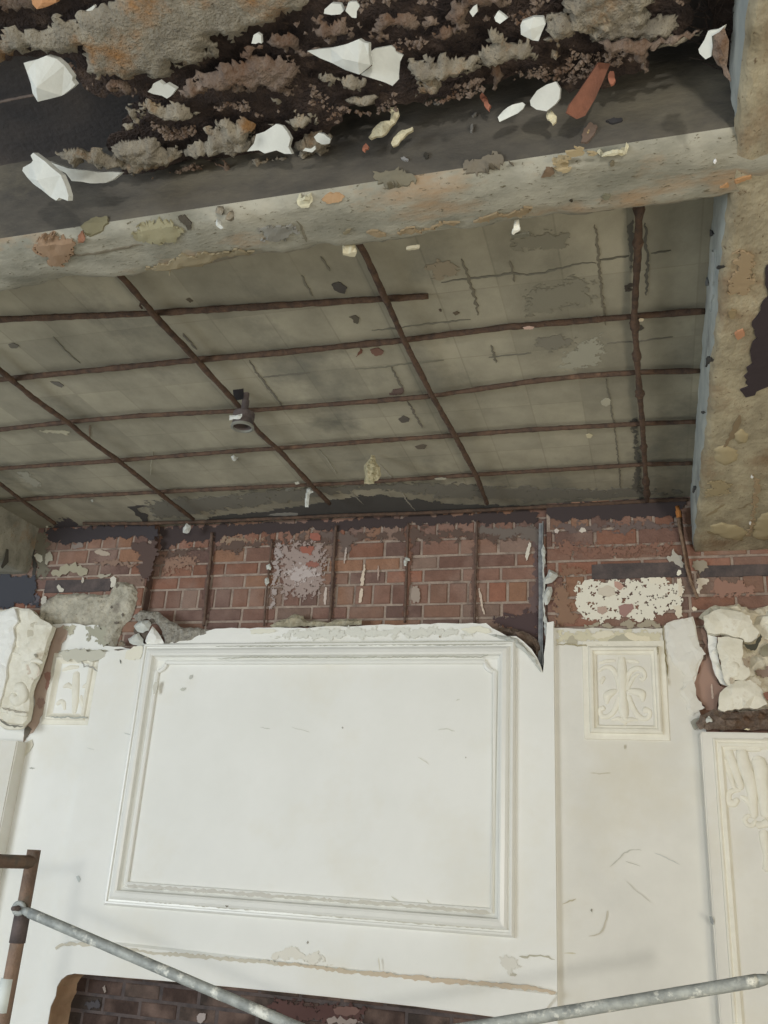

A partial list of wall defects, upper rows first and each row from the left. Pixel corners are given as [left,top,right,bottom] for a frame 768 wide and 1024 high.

spalling [541,142,629,178]
peeling [297,193,313,208]
rust [32,231,85,267]
spalling [740,264,768,397]
spalling [0,206,714,525]
peeling [34,551,118,592]
peeling [574,549,709,654]
spalling [23,625,106,756]
peeling [125,619,154,660]
spalling [691,628,733,730]
spalling [742,634,768,678]
crack [610,849,678,903]